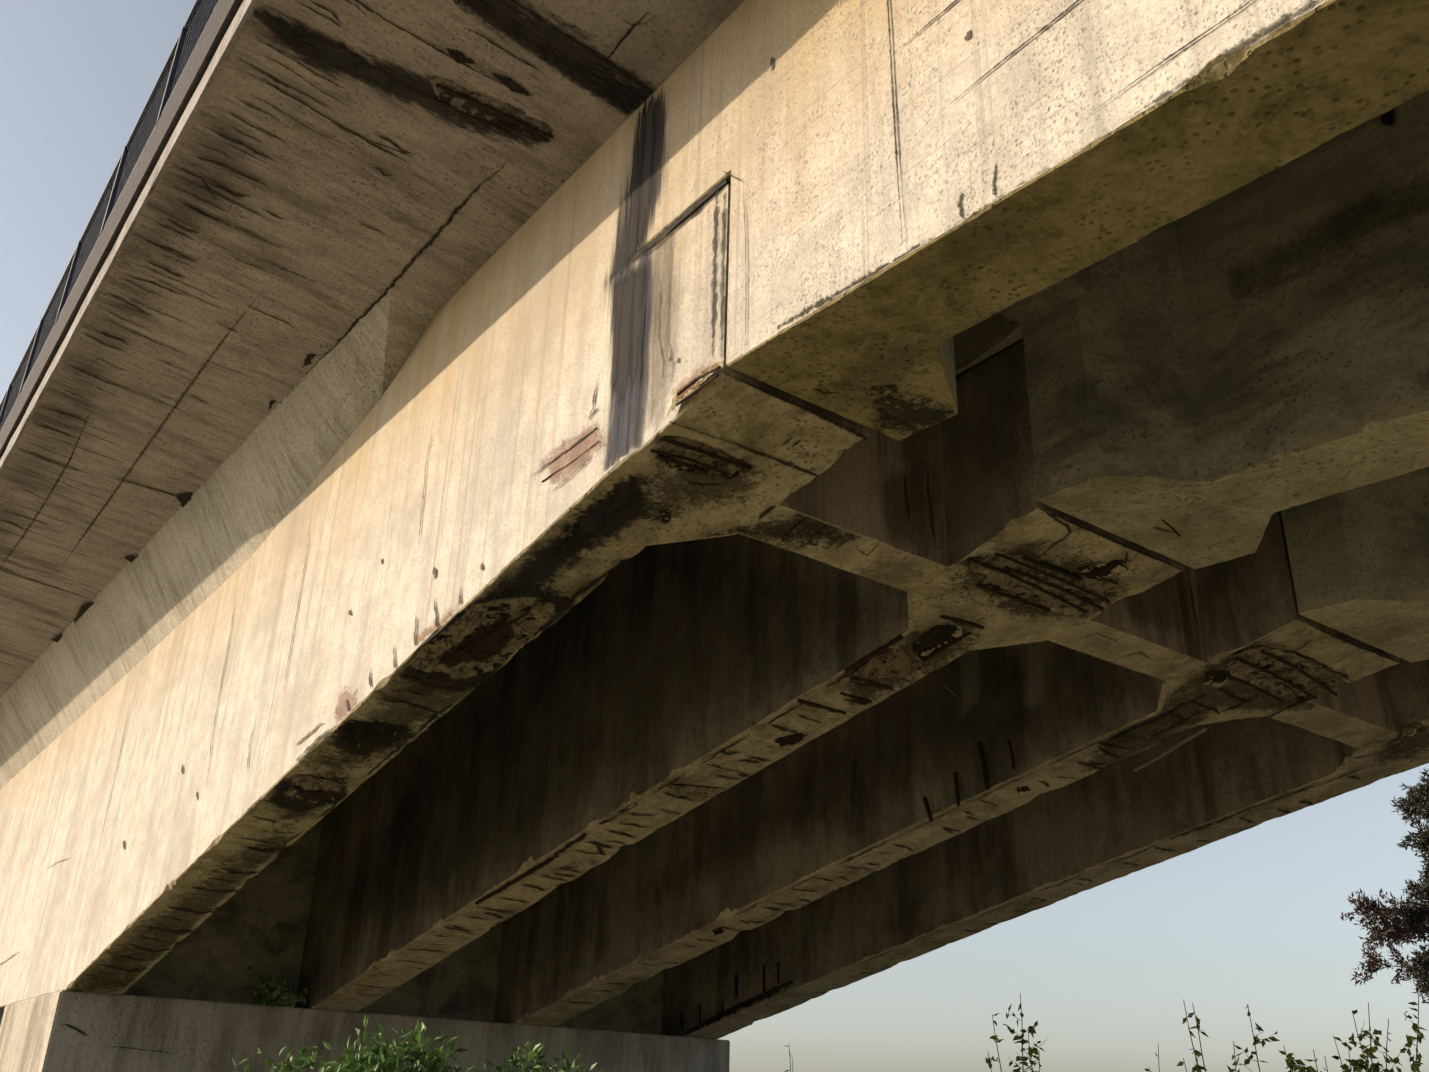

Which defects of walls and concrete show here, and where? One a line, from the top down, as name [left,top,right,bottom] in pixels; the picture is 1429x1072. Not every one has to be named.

damp [252,0,761,830]
spalling [667,362,723,416]
spalling [650,434,752,486]
damp [863,386,955,437]
damp [706,514,861,549]
spalling [967,552,1128,620]
spalling [393,581,574,696]
spalling [1017,639,1352,794]
spalling [74,668,416,992]
spalling [358,615,984,988]
spalling [922,741,997,834]